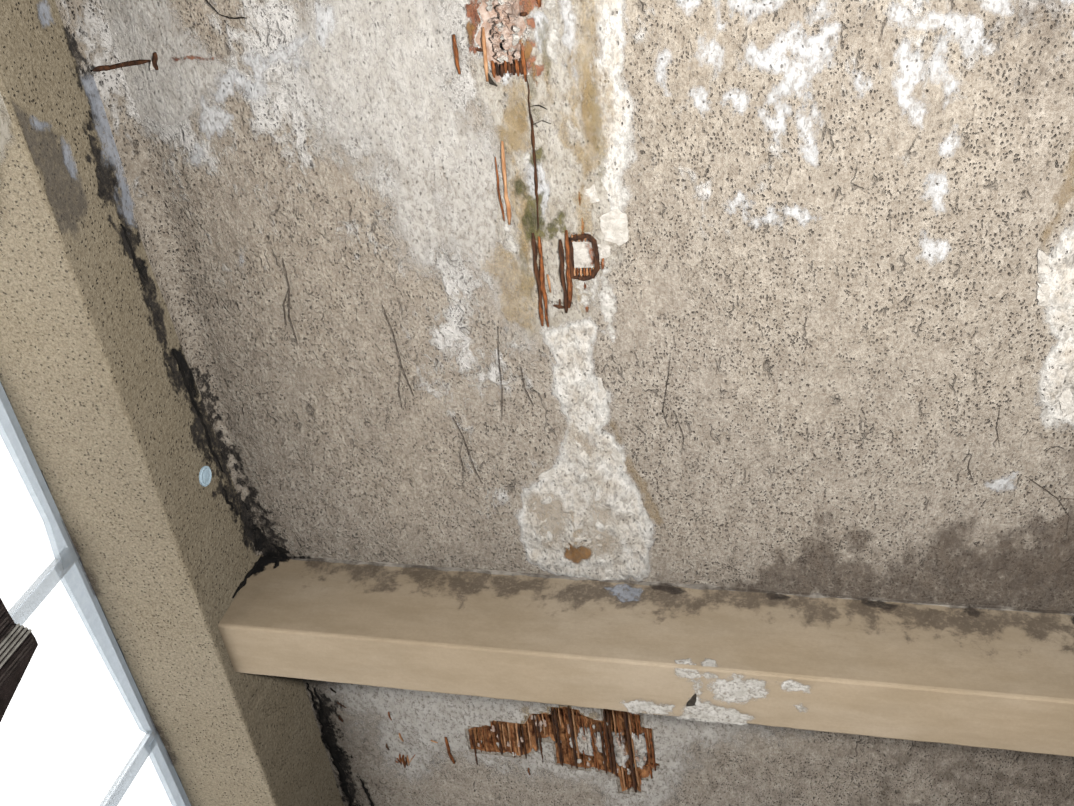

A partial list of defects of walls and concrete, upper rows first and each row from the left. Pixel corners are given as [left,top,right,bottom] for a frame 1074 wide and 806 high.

leakage [38,0,52,25]
crack [205,0,247,19]
spalling [466,0,544,86]
corrosion [495,141,512,225]
leakage [63,27,287,556]
leakage [297,0,653,582]
corrosion [531,230,573,327]
leakage [652,585,685,594]
leakage [862,599,898,609]
leakage [314,682,769,806]
spalling [468,658,767,793]
peeling [781,680,810,693]